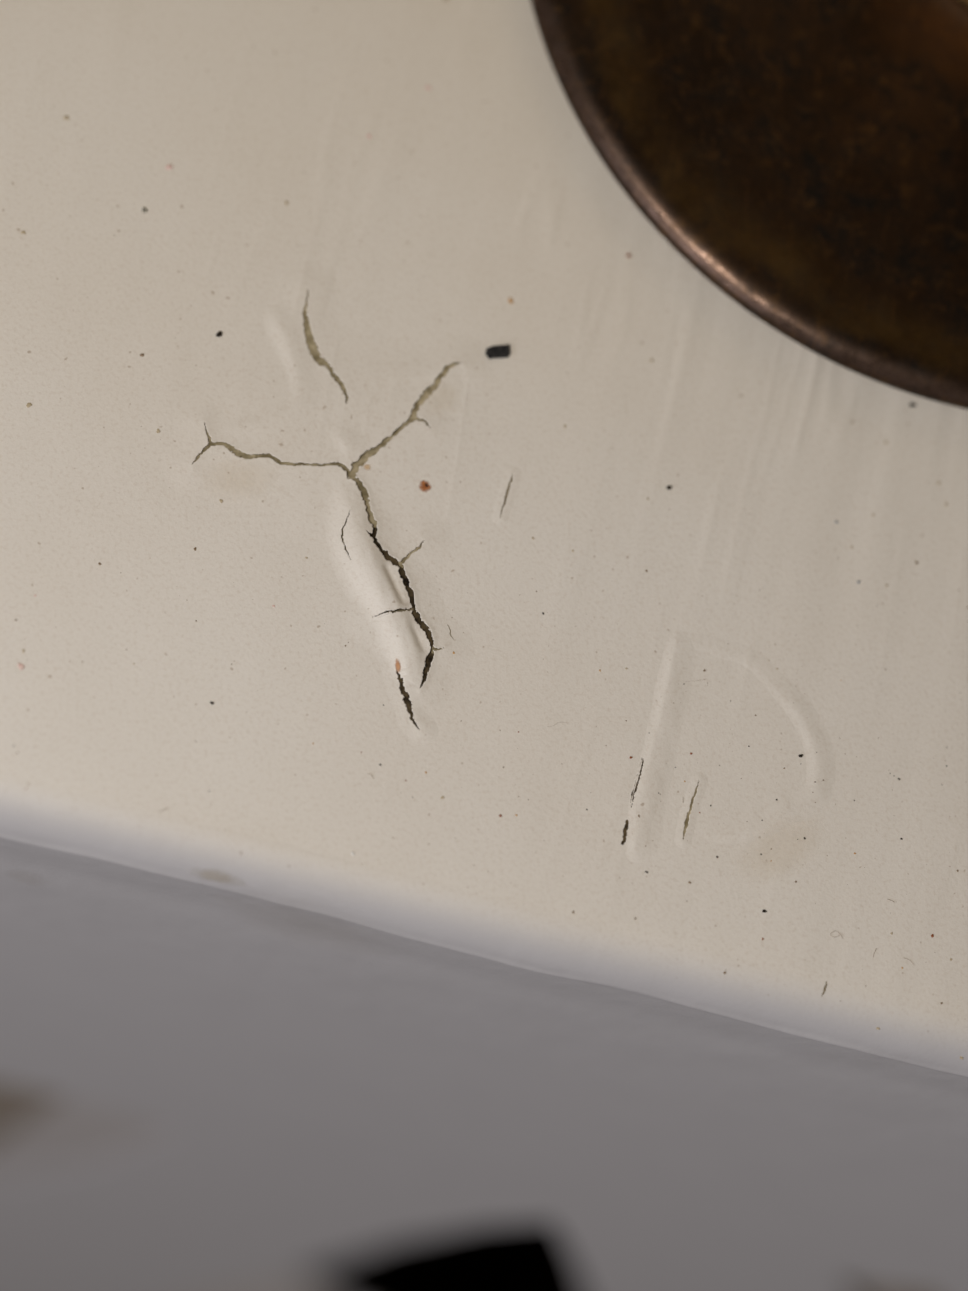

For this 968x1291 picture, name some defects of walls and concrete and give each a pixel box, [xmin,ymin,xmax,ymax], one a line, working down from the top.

crack [303,292,349,404]
crack [192,362,460,730]
crack [621,758,644,845]
crack [674,772,708,849]